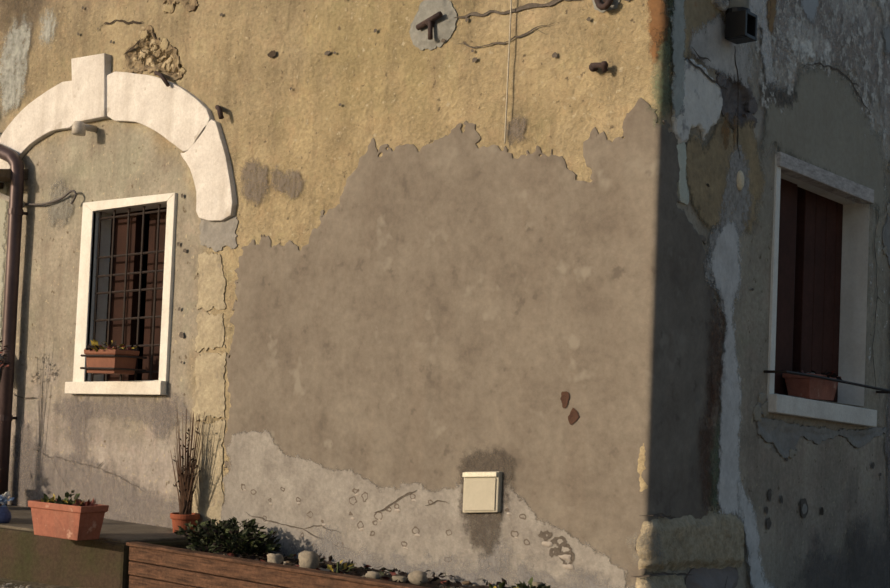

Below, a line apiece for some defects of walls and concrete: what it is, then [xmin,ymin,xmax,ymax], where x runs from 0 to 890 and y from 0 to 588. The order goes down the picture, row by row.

spalling [125,25,186,81]
spalling [162,0,199,14]
crack [455,0,569,48]
peeling [671,0,890,154]
water stain [705,145,773,588]
peeling [220,430,627,588]